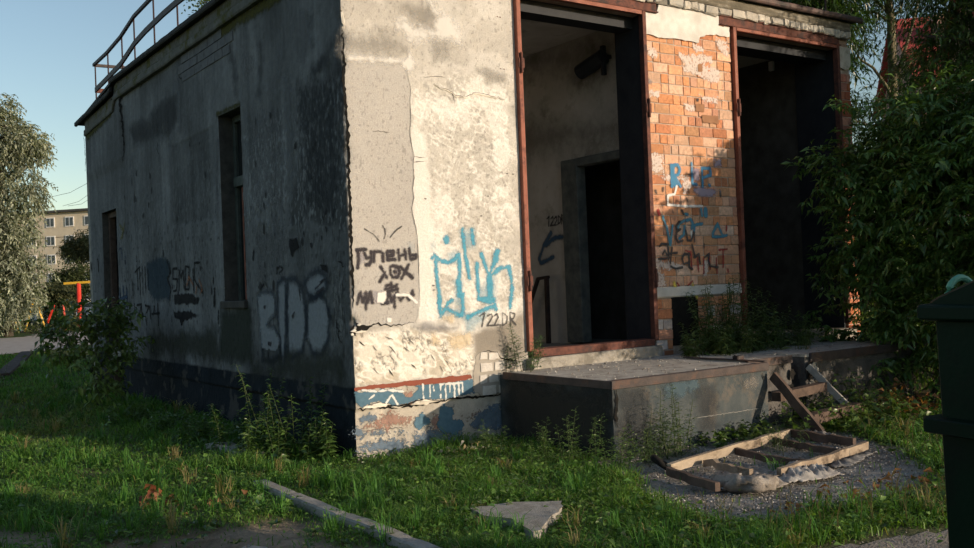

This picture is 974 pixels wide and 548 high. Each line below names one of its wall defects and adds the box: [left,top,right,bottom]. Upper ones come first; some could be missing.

crack [111,84,142,156]
spalling [696,104,719,124]
peeling [348,322,502,455]